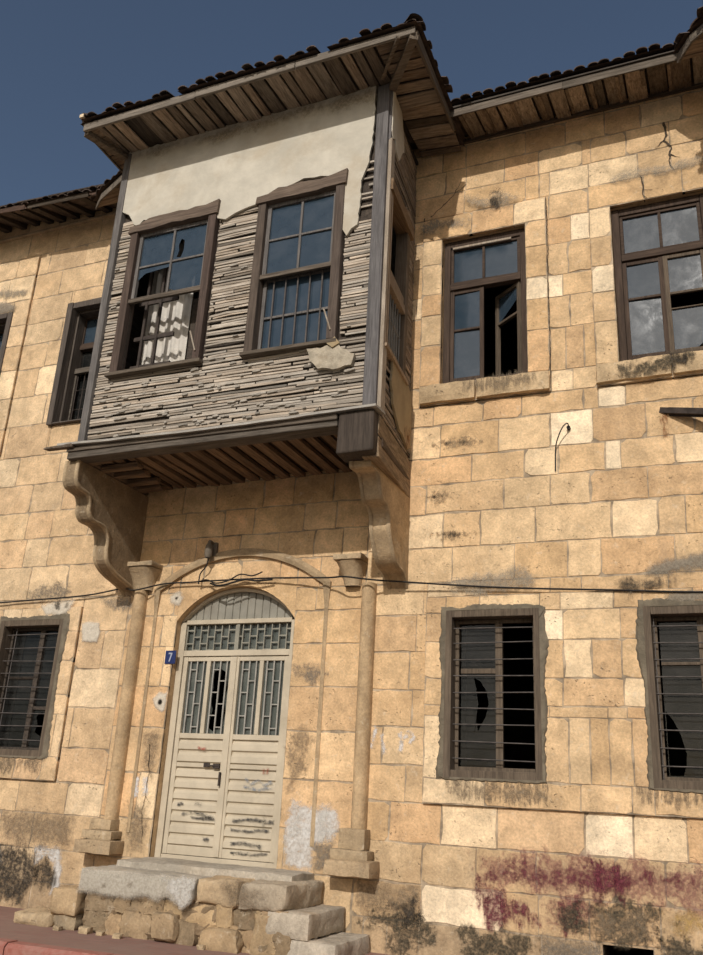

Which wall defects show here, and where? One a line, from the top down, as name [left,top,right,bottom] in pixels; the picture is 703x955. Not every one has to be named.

crack [657,122,678,167]
peeling [307,336,356,371]
water stain [617,351,696,378]
water stain [453,780,548,805]
water stain [314,844,331,869]
water stain [584,860,661,948]